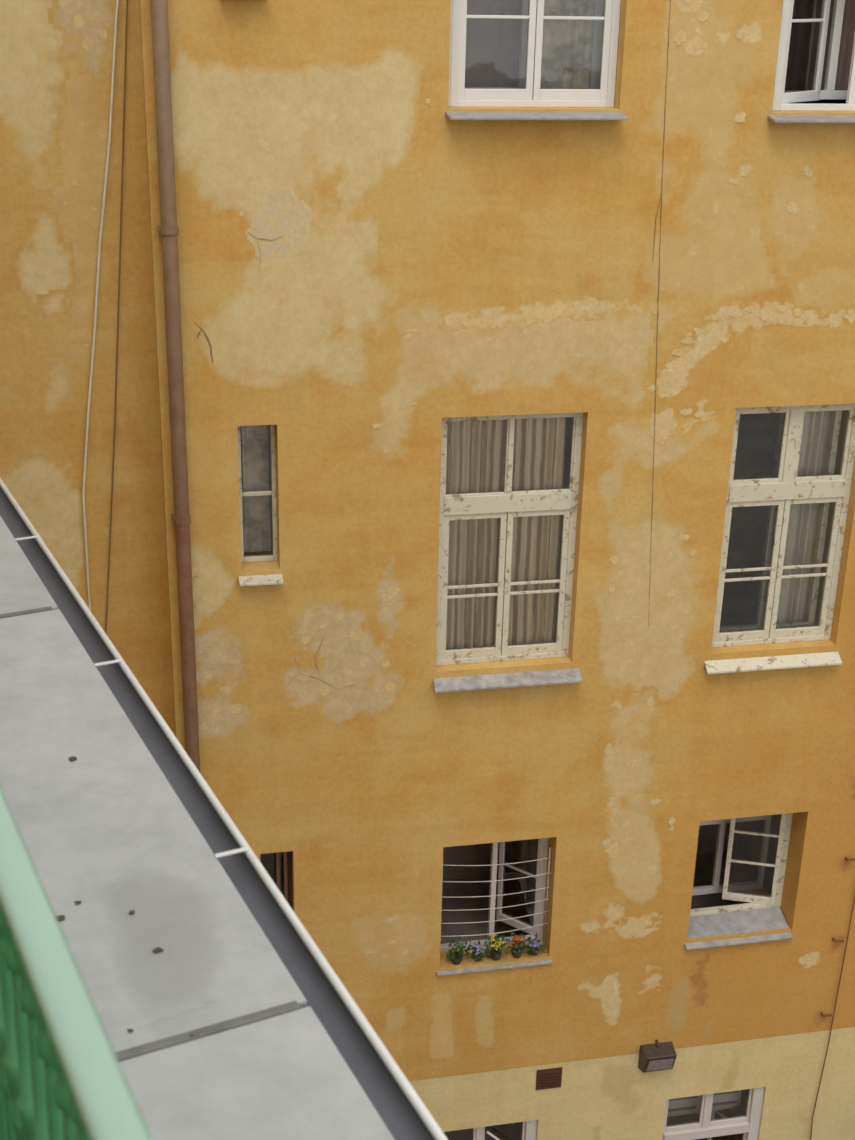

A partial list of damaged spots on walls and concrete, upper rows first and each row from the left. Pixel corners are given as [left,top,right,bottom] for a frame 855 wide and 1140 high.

peeling [659,0,764,57]
flaking render [0,0,123,416]
crack [246,231,283,271]
crack [195,323,214,363]
flaking render [0,444,90,594]
flaking render [170,41,855,940]
leakage [91,868,244,1029]
peeling [577,972,623,1026]
peeling [638,964,663,995]